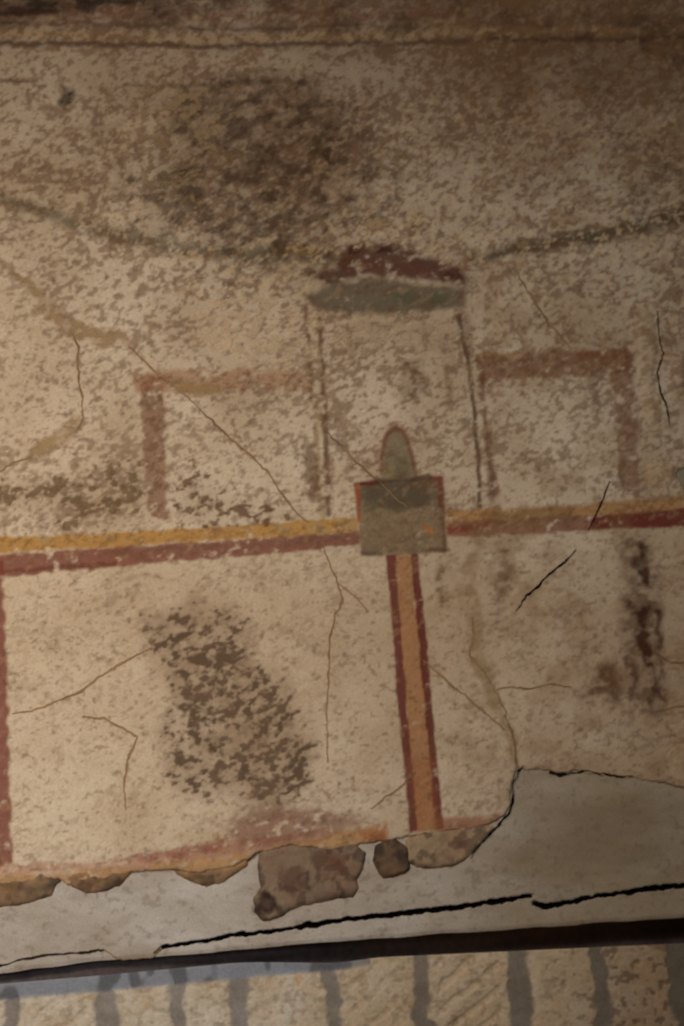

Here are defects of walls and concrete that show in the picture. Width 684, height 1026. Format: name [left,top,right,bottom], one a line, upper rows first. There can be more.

crack [657,311,670,425]
crack [516,481,610,611]
damp [633,543,649,585]
damp [634,606,662,666]
damp [143,609,315,803]
flaking render [0,872,132,907]
flaking render [174,825,495,922]
crack [0,883,684,967]